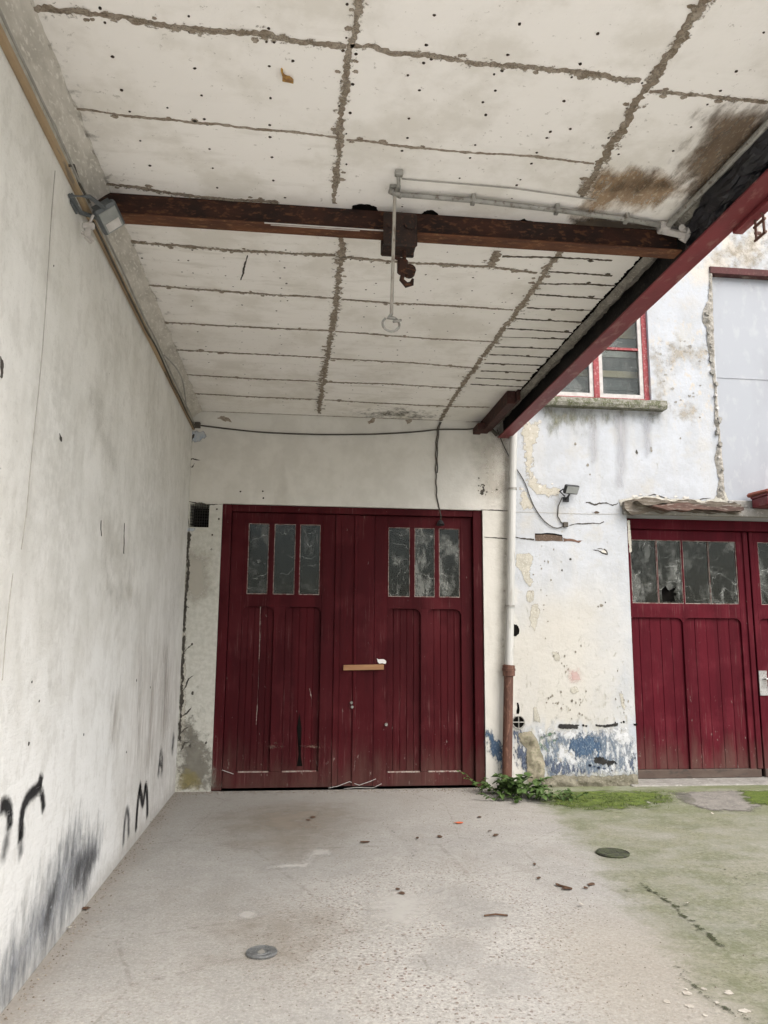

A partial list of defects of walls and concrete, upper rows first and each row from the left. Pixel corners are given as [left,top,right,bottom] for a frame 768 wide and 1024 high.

spalling [619,270,728,506]
peeling [519,420,560,510]
peeling [514,533,581,639]
spalling [533,687,638,787]